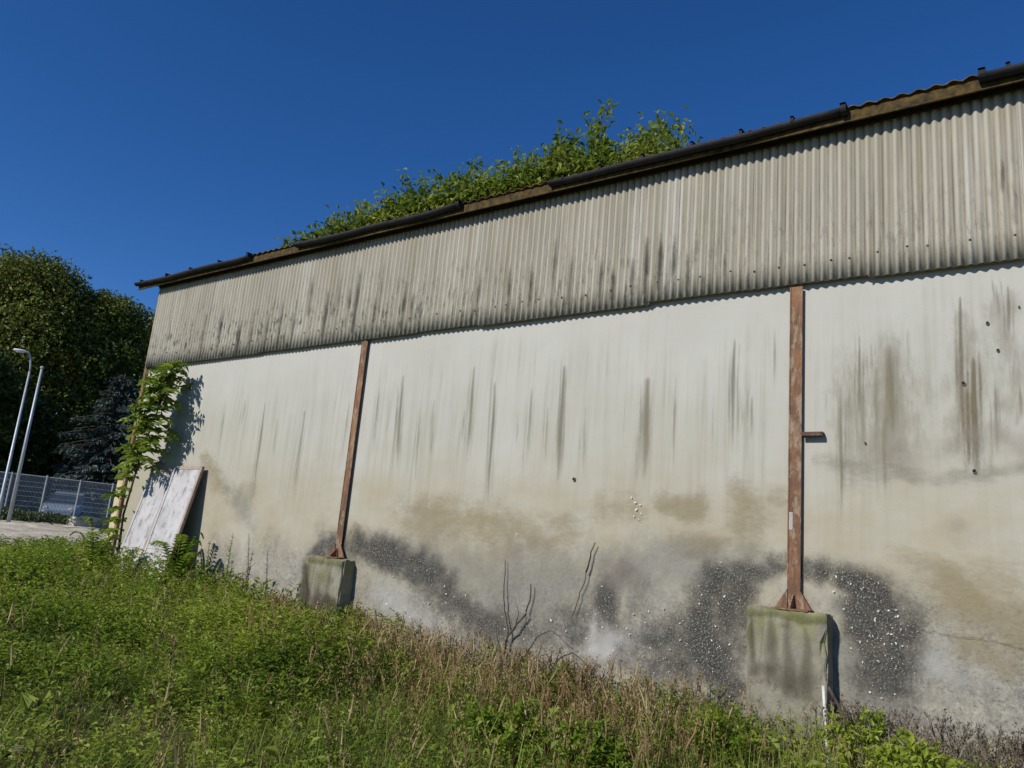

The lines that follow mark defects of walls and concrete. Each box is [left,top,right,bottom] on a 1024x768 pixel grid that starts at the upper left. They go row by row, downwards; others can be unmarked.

leakage [631,247,675,284]
leakage [959,304,981,455]
leakage [297,529,540,646]
leakage [550,560,785,703]
leakage [801,561,961,699]